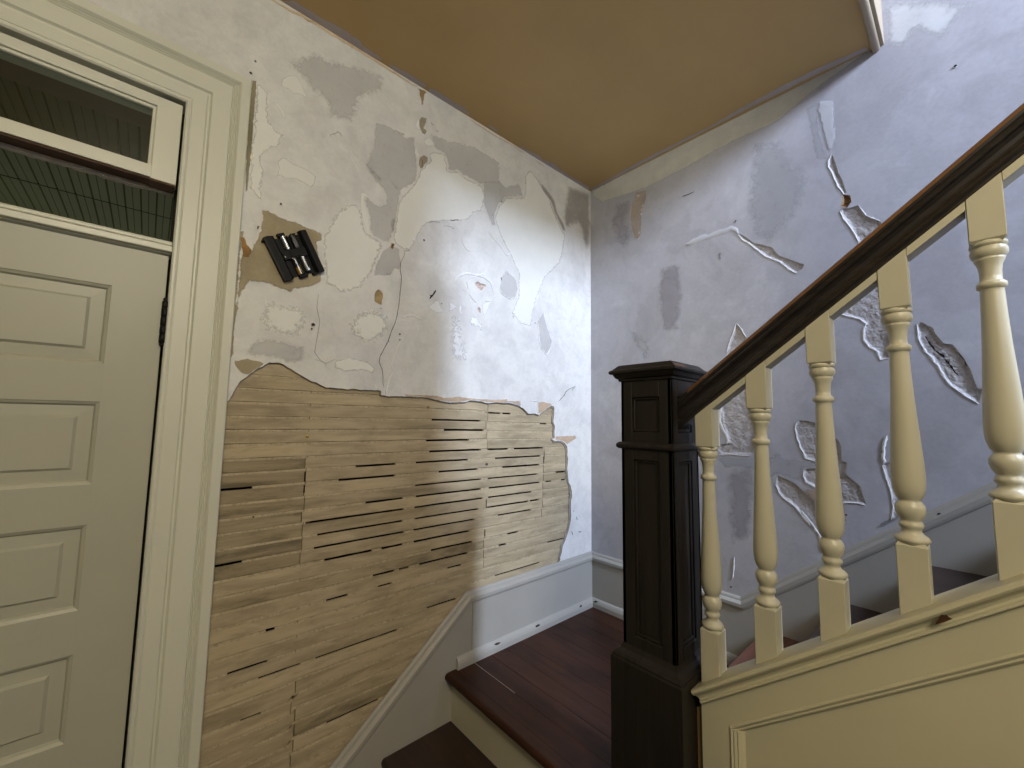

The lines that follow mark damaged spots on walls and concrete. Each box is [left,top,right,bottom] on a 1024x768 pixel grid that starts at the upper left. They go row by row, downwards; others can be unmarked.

spalling [827,154,881,243]
spalling [735,220,804,273]
spalling [726,323,746,356]
spalling [842,287,889,361]
spalling [916,322,982,404]
spalling [718,389,754,456]
spalling [227,363,576,562]
spalling [775,420,821,539]
spalling [835,439,866,506]